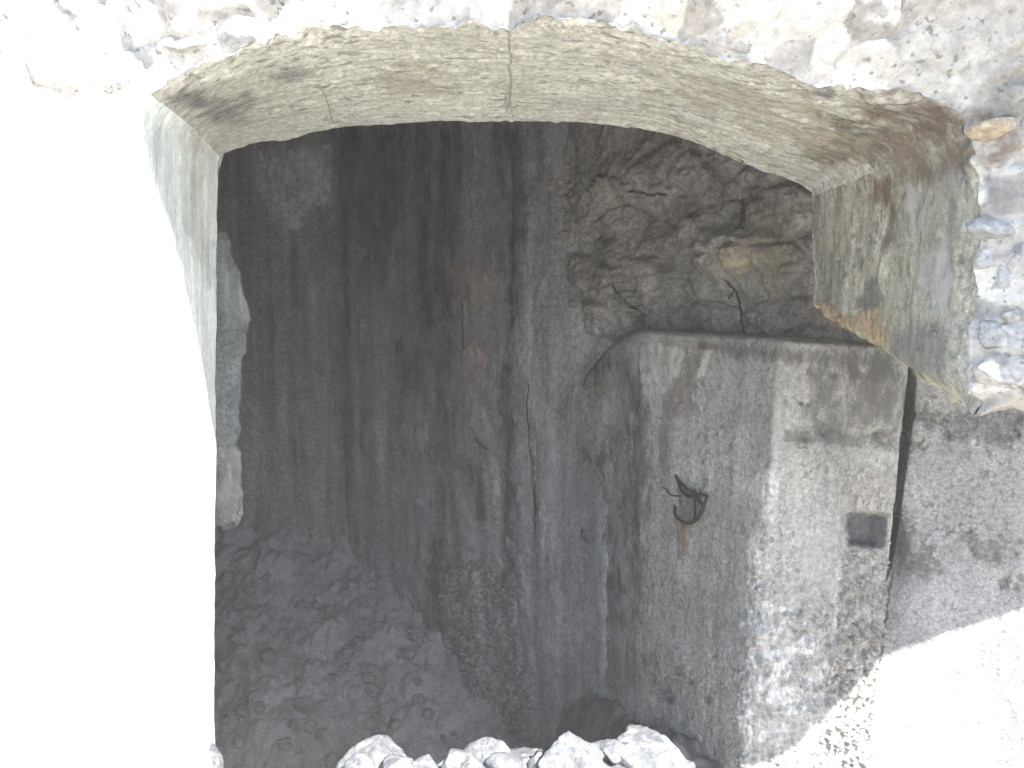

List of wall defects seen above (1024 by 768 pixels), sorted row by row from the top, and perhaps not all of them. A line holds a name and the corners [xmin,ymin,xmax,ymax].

crack [504,30,514,120]
water stain [397,129,456,637]
crack [526,384,537,536]
water stain [455,467,490,639]